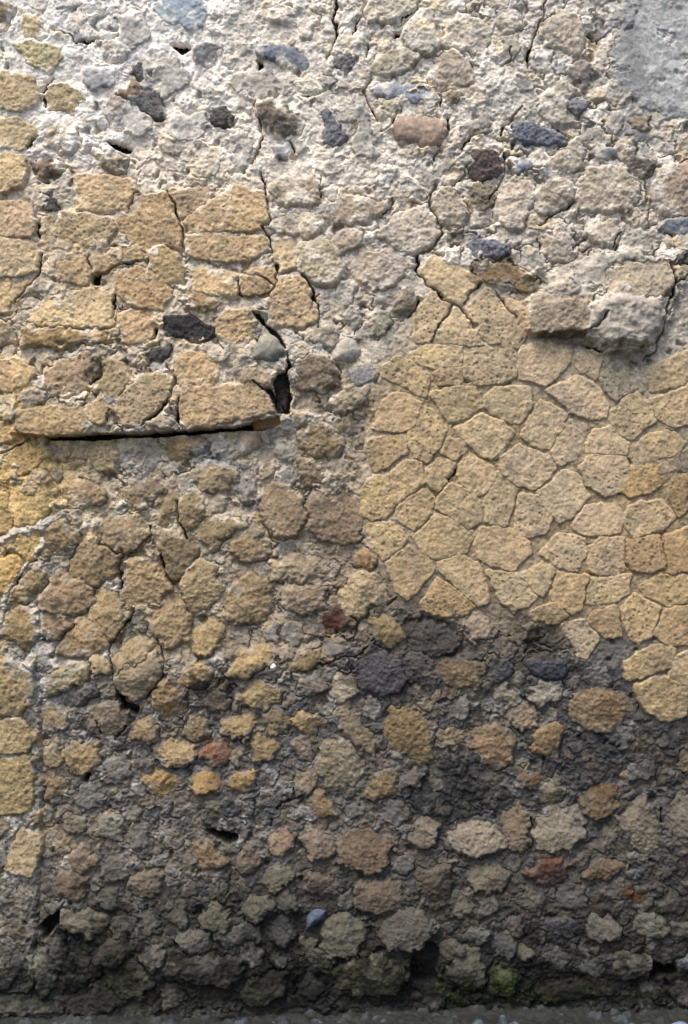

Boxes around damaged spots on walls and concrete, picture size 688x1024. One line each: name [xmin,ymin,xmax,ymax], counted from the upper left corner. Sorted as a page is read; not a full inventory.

crack [35,223,43,278]
crack [238,291,292,404]
crack [148,401,180,425]